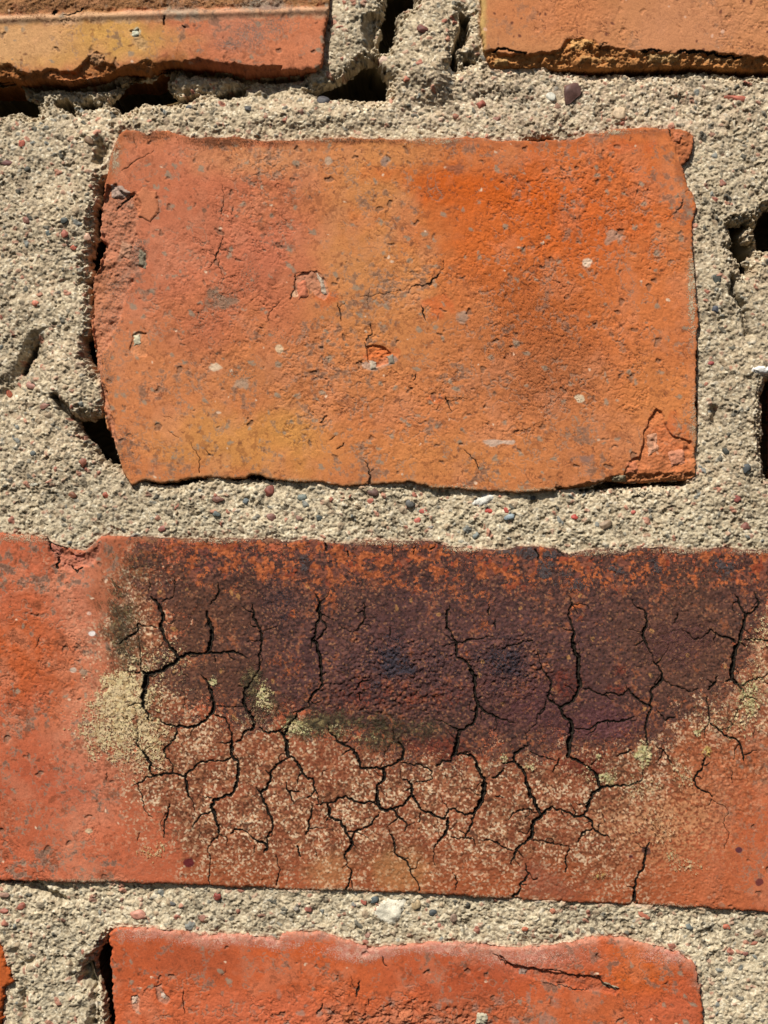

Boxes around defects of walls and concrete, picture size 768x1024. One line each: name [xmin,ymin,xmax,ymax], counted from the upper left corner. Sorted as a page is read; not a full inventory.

spalling [0,29,169,103]
spalling [182,57,283,81]
spalling [484,36,768,78]
spalling [294,271,329,300]
spalling [366,345,394,370]
spalling [555,408,696,490]
crack [119,580,768,904]
crack [494,954,619,990]